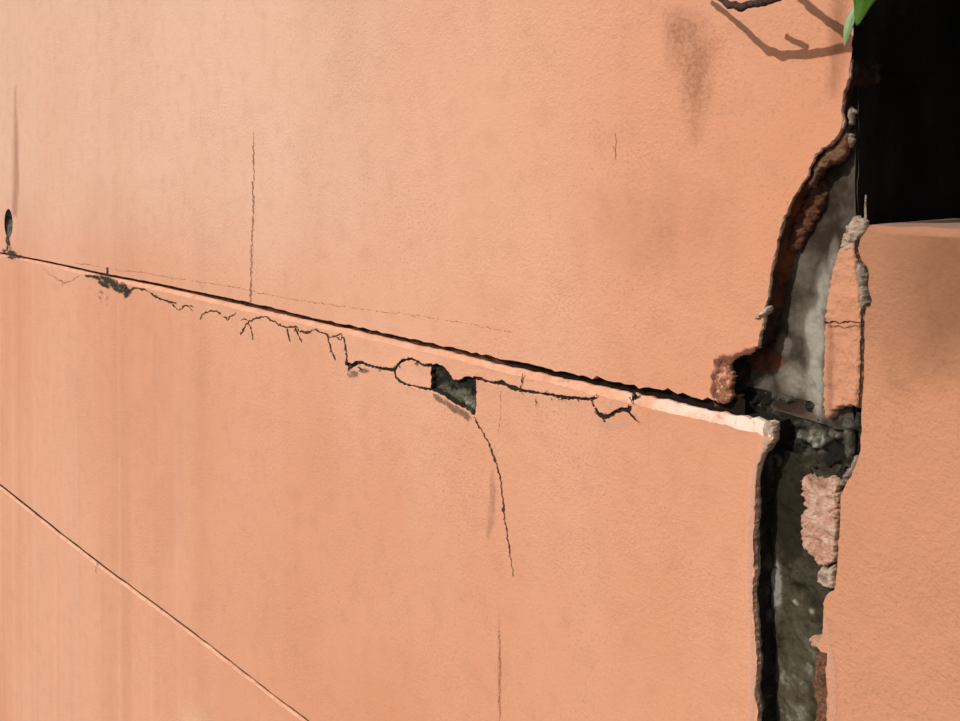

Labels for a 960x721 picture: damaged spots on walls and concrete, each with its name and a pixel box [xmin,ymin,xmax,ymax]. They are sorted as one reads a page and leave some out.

crack [0,134,745,576]
spalling [436,364,477,411]
spalling [710,84,870,589]